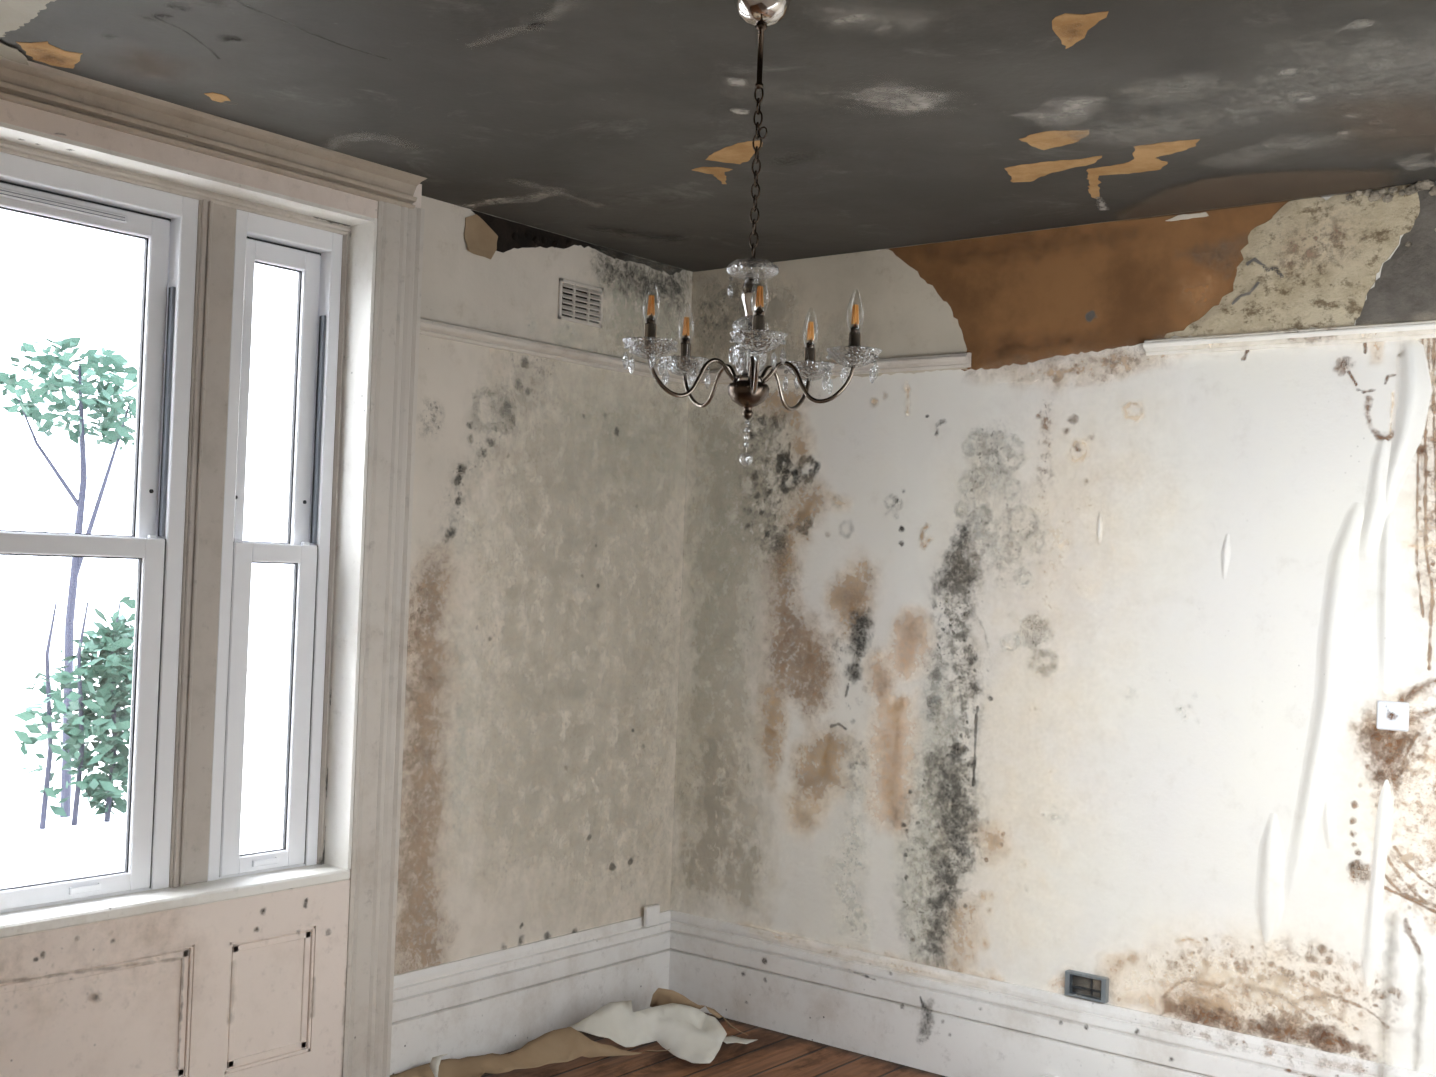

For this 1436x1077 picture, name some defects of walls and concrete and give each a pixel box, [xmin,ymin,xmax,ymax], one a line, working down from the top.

spalling [1052,11,1109,49]
spalling [16,41,83,69]
spalling [204,92,237,105]
spalling [692,140,763,184]
peeling [464,214,498,260]
flaking render [889,130,1436,383]
leakage [597,256,682,342]
leakage [701,289,786,353]
leakage [469,360,540,457]
leakage [401,566,447,970]
leakage [984,832,1005,862]